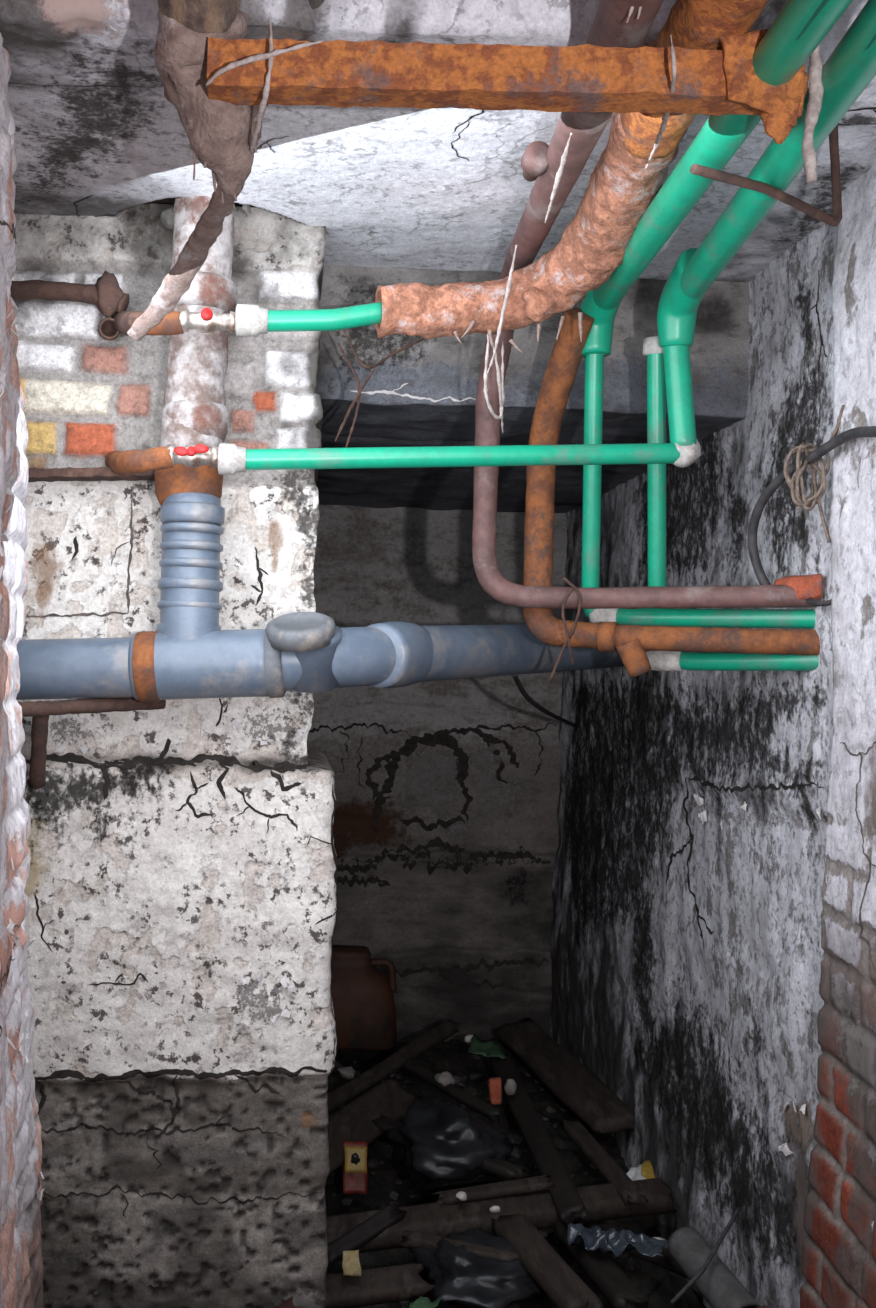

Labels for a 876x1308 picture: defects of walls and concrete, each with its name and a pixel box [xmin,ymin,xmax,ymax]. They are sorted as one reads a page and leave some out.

spalling [38,0,124,39]
crack [308,0,324,10]
crack [0,891,54,991]
crack [25,698,556,1217]
water stain [564,661,828,1288]